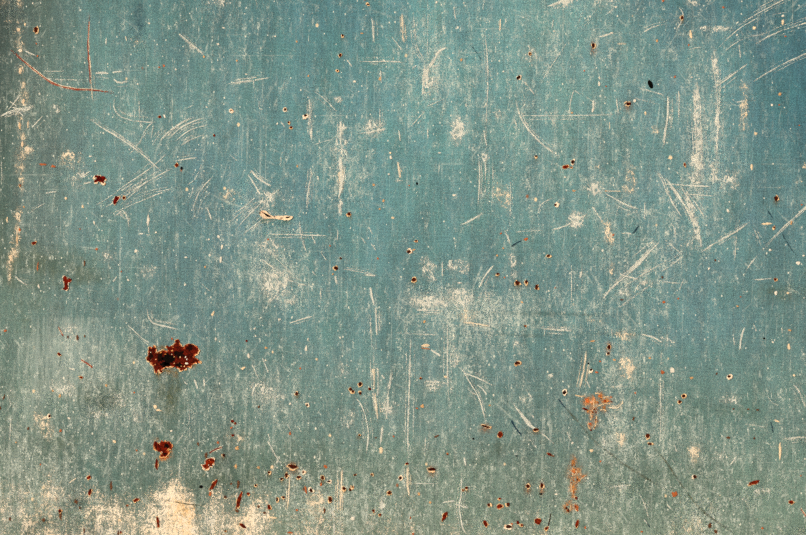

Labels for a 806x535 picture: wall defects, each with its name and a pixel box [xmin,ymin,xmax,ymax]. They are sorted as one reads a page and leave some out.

peeling [259,210,293,221]
rust [146,338,202,374]
rust [576,392,612,431]
peeling [0,470,293,535]
rust [153,440,174,460]
rust [201,452,215,471]
spalling [280,464,307,481]
peeling [290,507,355,535]
peeling [487,497,548,533]
rust [565,459,586,512]